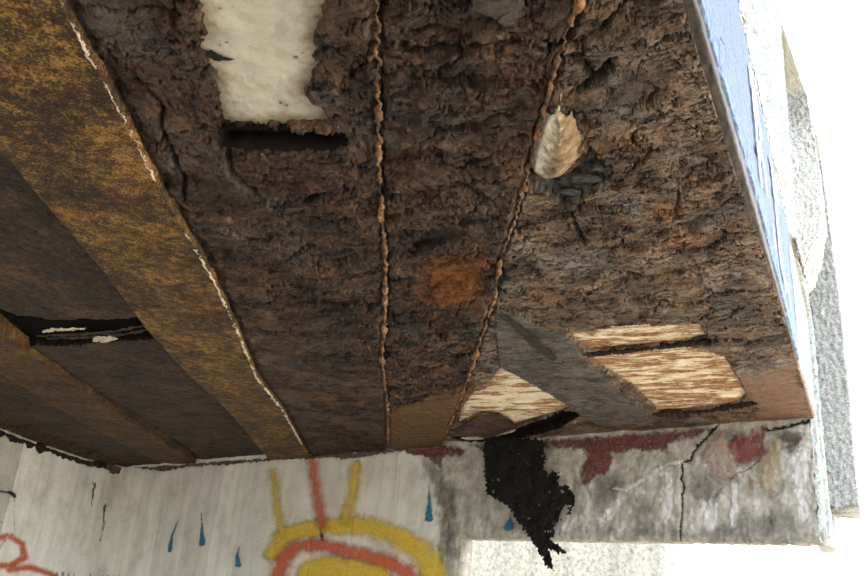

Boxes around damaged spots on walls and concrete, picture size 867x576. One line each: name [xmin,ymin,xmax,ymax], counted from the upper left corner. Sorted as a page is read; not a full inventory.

peeling [70,23,97,69]
spalling [196,0,348,152]
crack [401,36,522,55]
peeling [103,82,156,181]
corrosion [372,0,390,447]
peeling [0,308,153,347]
peeling [193,249,303,445]
corrosion [446,0,586,571]
spalling [570,323,756,418]
crack [716,426,765,497]